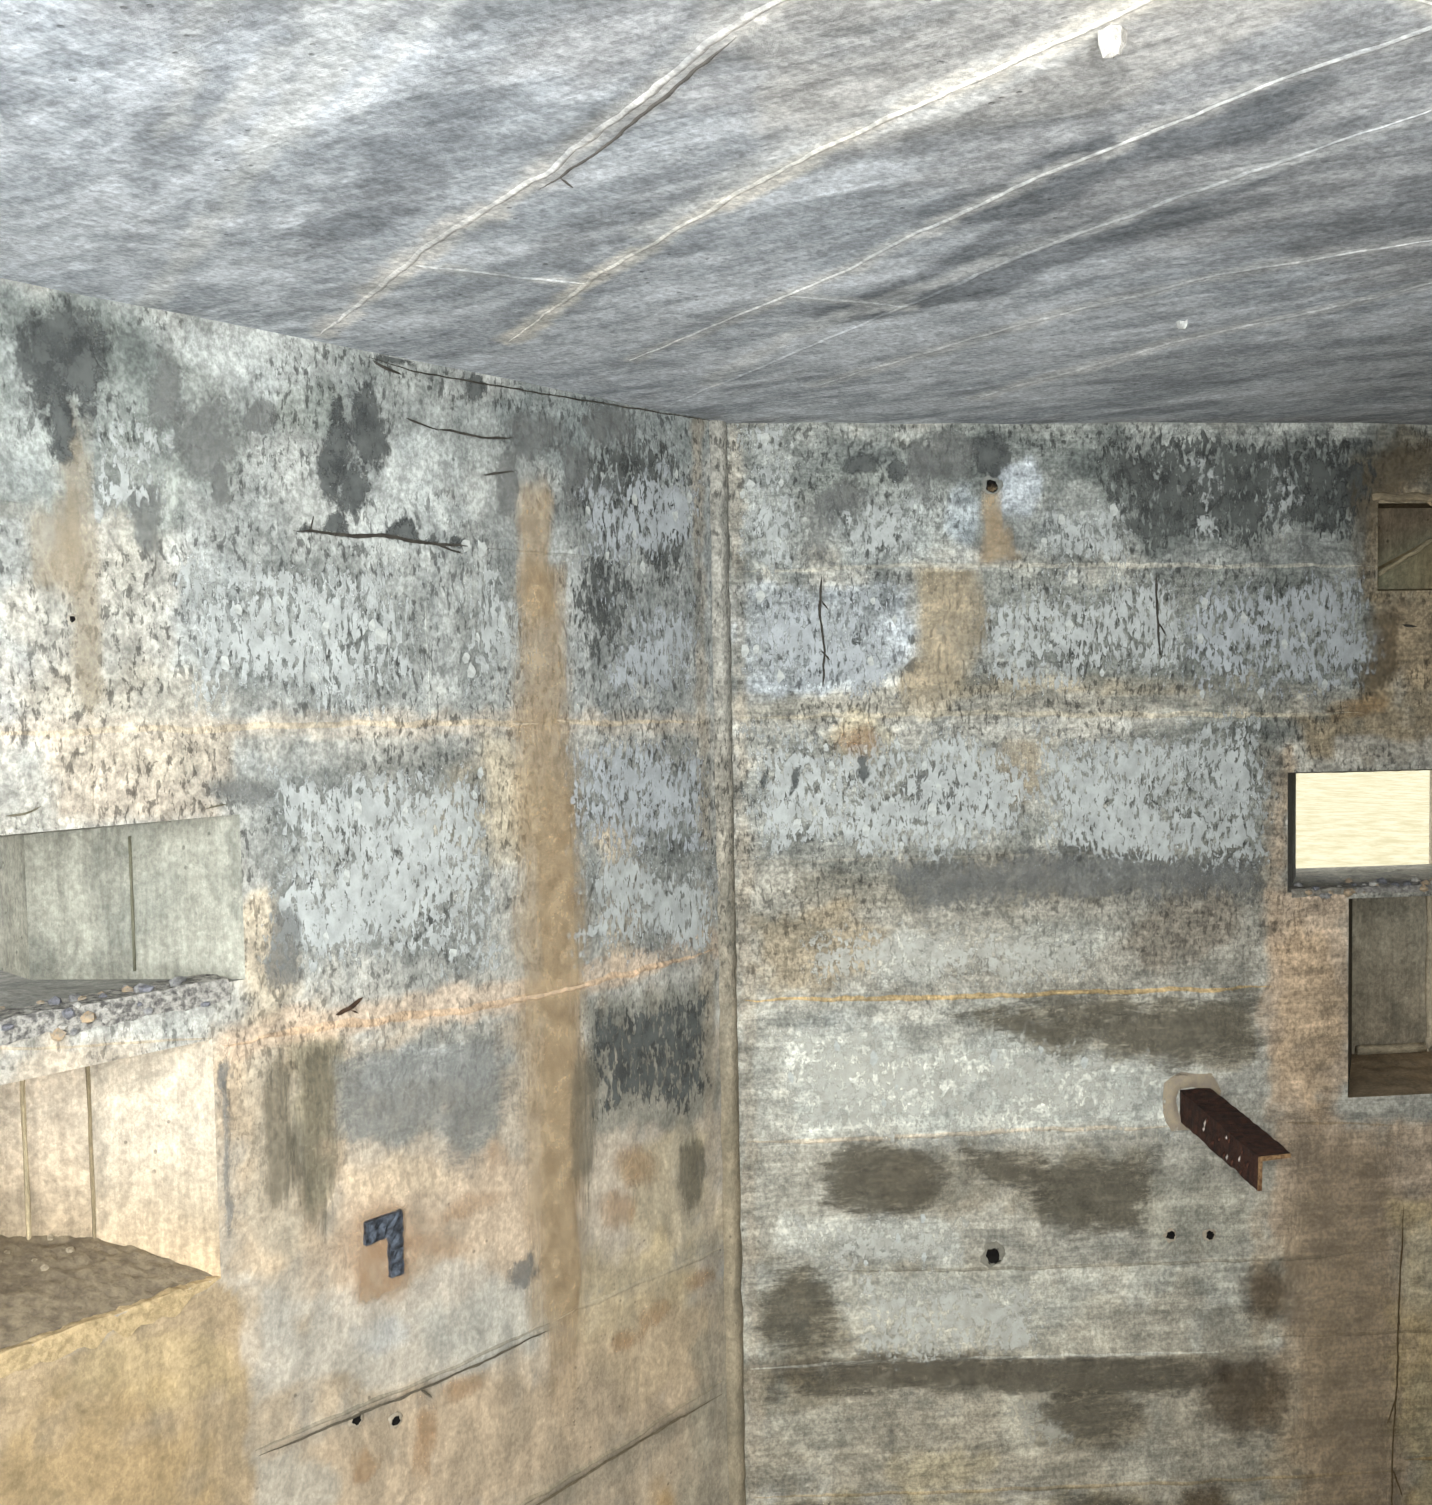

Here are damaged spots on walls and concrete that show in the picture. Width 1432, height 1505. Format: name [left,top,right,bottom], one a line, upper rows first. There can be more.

crack [537,37,736,190]
water stain [13,294,112,464]
water stain [376,354,414,366]
water stain [466,374,486,406]
water stain [299,381,391,538]
crack [293,516,465,554]
water stain [386,517,465,548]
water stain [584,991,712,1119]
water stain [765,1267,834,1348]
water stain [787,1354,1188,1441]
water stain [1207,1360,1283,1427]